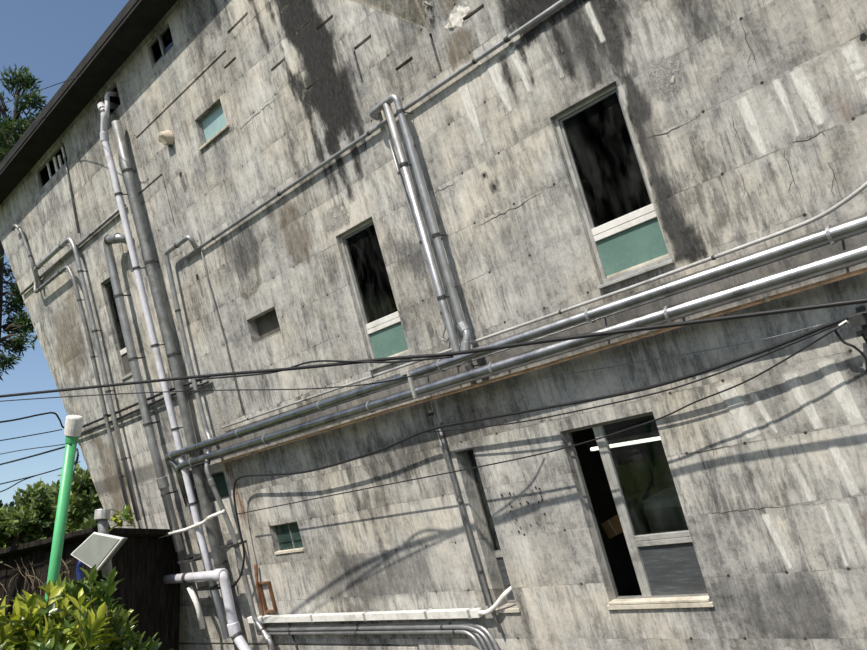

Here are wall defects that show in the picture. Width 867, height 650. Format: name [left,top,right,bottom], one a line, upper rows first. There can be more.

spalling [445,1,471,30]
water stain [267,0,367,206]
water stain [458,84,484,144]
crack [479,184,556,226]
water stain [487,0,707,262]
crack [784,126,838,209]